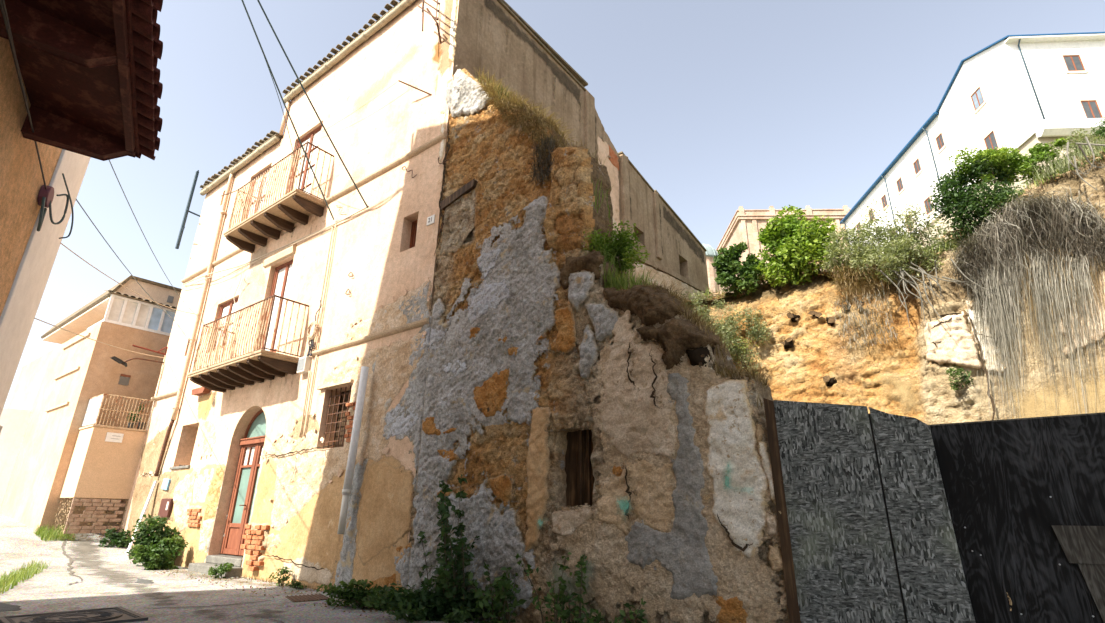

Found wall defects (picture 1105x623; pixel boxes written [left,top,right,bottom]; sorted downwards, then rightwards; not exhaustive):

flaking render [240,195,789,623]
crack [626,342,664,406]